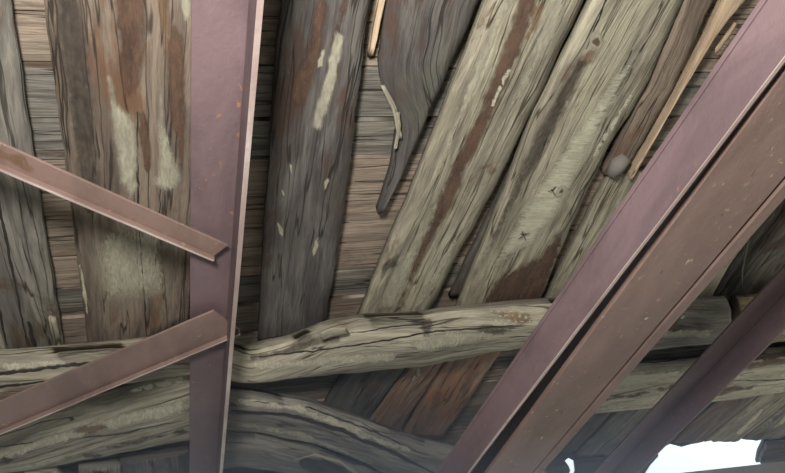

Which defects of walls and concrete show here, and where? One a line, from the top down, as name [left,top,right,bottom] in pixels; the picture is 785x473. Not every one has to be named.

damp [61,0,96,183]
damp [116,0,144,94]
damp [168,26,184,158]
damp [139,113,150,172]
crack [0,362,89,389]
crack [250,322,513,358]